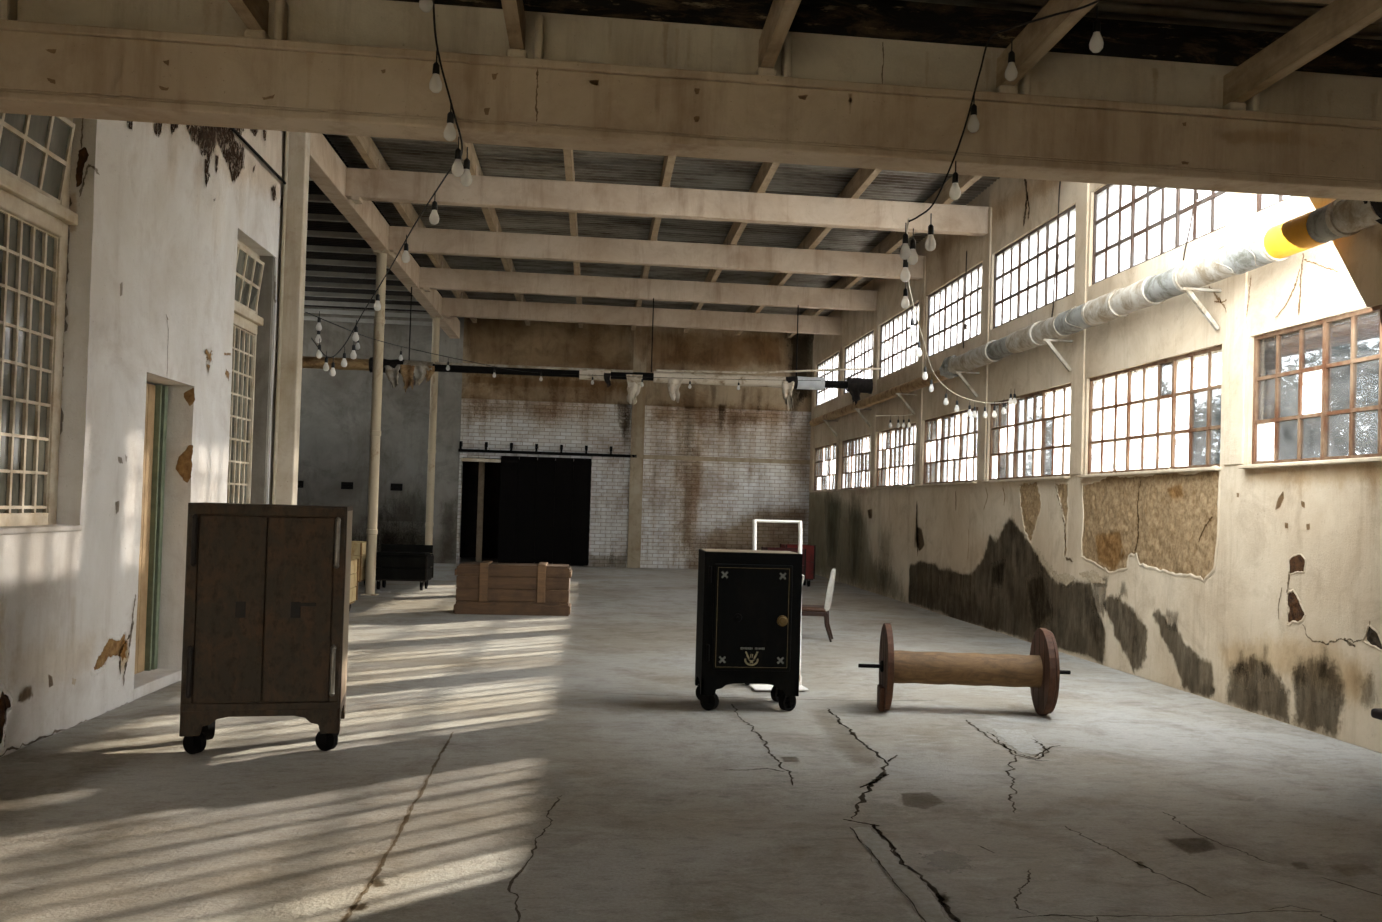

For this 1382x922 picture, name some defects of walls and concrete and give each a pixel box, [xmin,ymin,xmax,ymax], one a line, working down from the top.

peeling [154,123,267,187]
flaking render [1019,465,1221,586]
flaking render [90,629,130,677]
leakage [909,520,1343,734]
flaking render [1278,553,1306,626]
flaking render [0,682,32,751]
crack [729,704,793,785]
crack [966,720,1061,812]
crack [828,709,961,922]
crack [507,795,562,922]
crack [1013,869,1099,922]
crack [1065,826,1212,898]